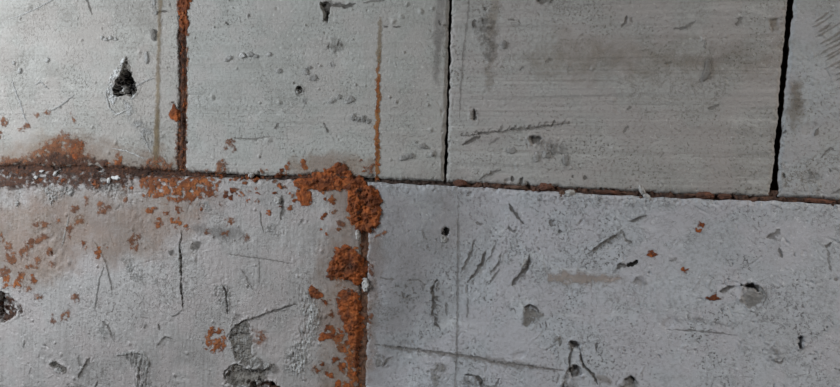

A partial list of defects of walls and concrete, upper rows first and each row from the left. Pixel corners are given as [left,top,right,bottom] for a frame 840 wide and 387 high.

spalling [105,58,152,142]
corrosion [0,0,386,300]
spalling [0,292,23,322]
corrosion [204,326,226,354]
spalling [224,293,319,387]
corrosion [309,244,374,387]